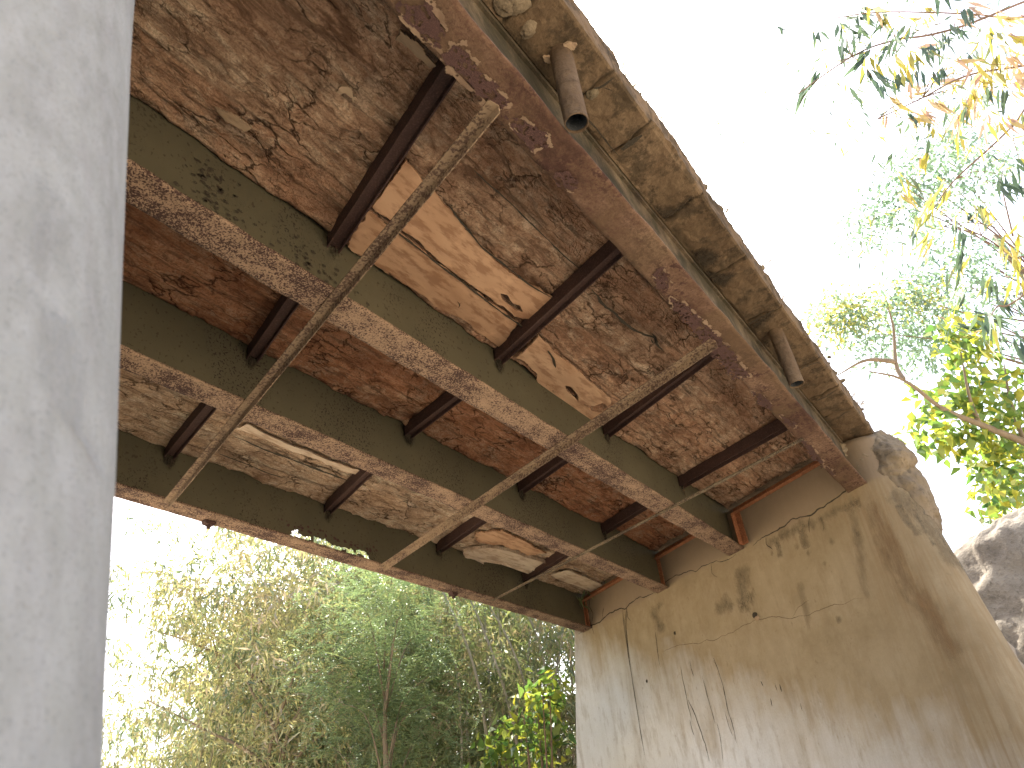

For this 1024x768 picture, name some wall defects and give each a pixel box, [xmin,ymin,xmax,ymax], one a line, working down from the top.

rust [395,0,553,154]
peeling [348,160,423,255]
peeling [374,191,552,347]
peeling [516,335,611,420]
rust [652,267,753,380]
peeling [236,423,360,474]
peeling [463,544,602,592]
crack [579,490,855,759]